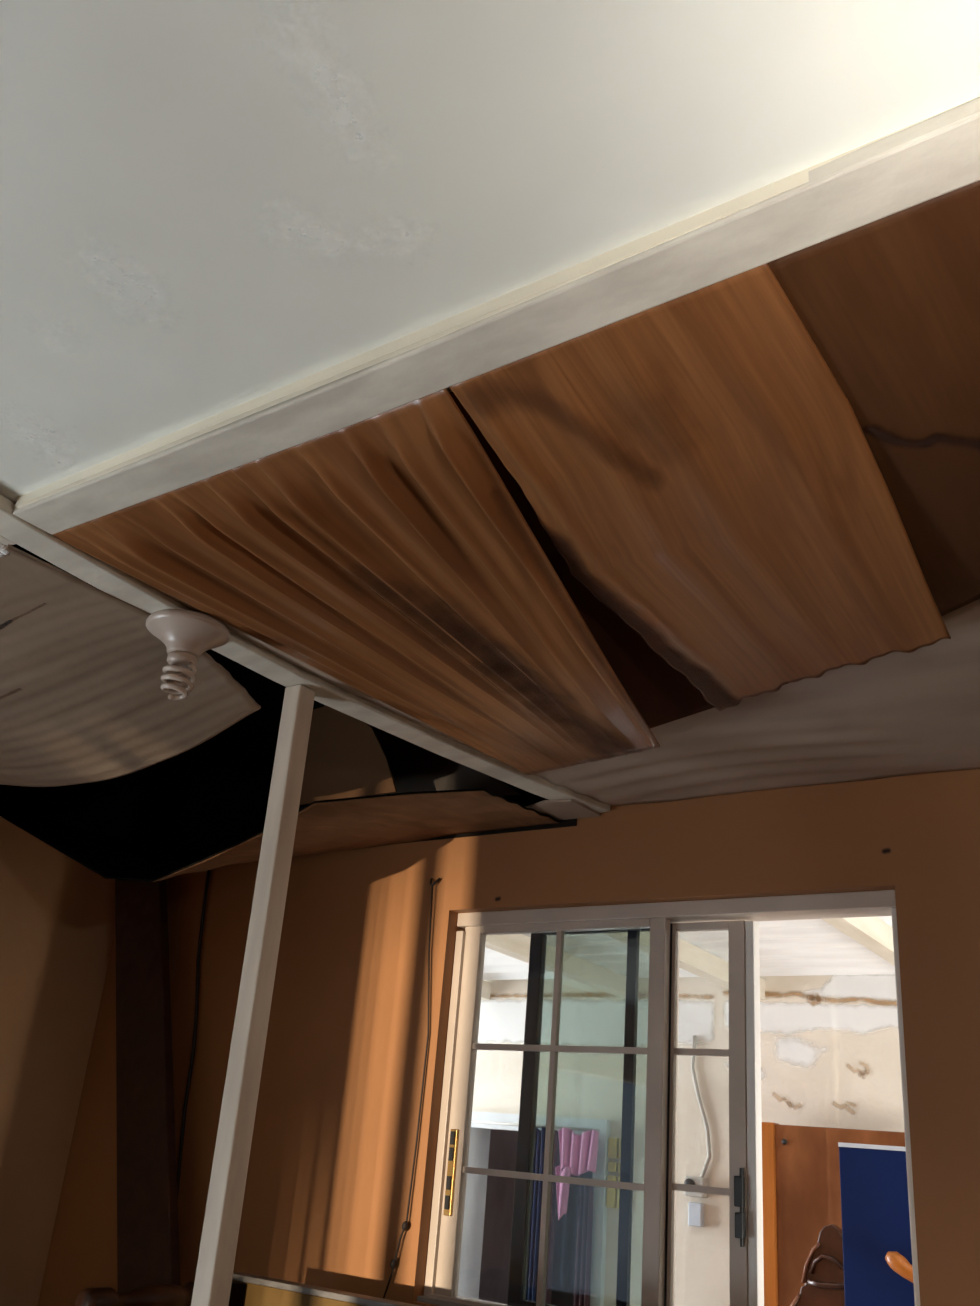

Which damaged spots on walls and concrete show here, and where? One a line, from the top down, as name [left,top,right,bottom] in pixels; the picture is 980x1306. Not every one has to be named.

leakage [411,607,632,756]
leakage [547,533,738,710]